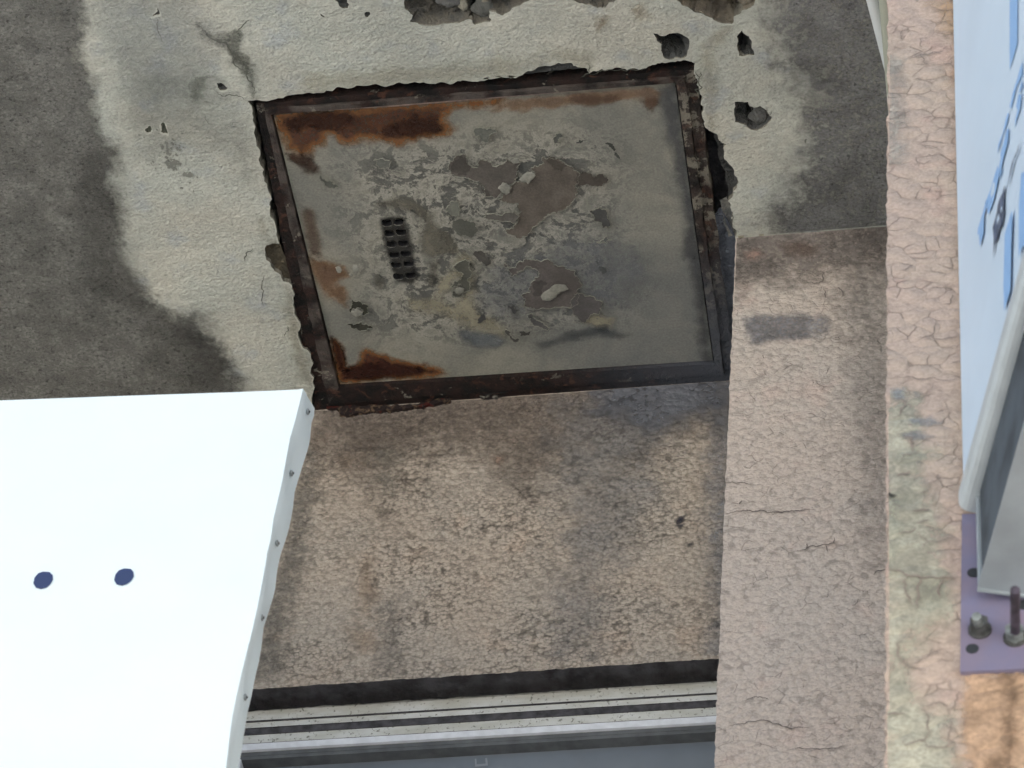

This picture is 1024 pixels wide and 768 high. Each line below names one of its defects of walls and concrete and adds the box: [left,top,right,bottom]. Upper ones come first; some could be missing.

spalling [404,0,526,25]
spalling [655,33,689,59]
rust [275,89,656,173]
spalling [734,102,771,129]
damp [0,0,235,400]
peeling [446,154,608,239]
peeling [589,207,611,244]
peeling [347,300,373,331]
peeling [450,251,603,343]
damp [749,314,827,343]
rust [330,338,445,384]